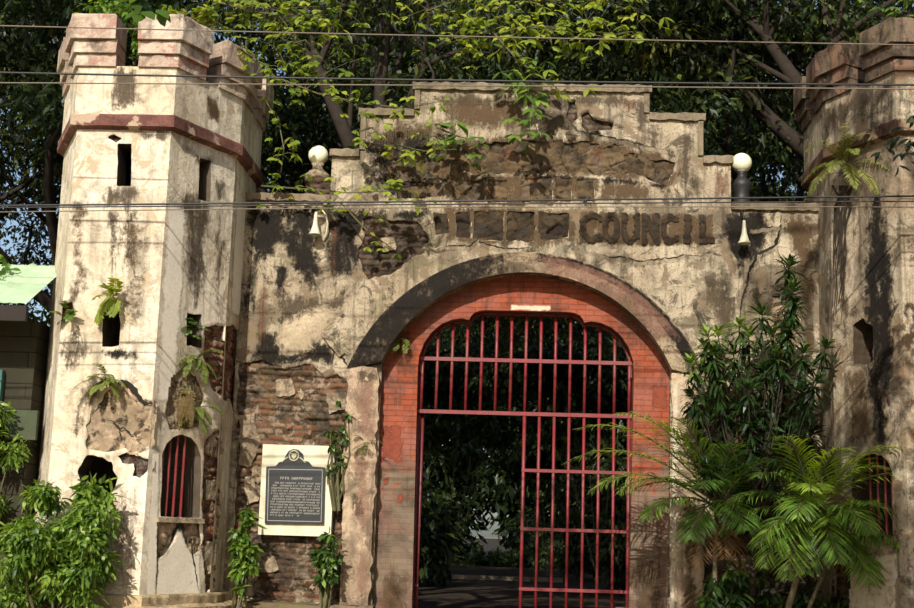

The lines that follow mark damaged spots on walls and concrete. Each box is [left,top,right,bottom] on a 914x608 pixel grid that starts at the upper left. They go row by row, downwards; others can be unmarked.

damp [111,67,139,110]
damp [181,193,225,305]
flaking render [86,204,348,602]
damp [247,333,333,366]
damp [242,206,425,323]
flaking render [358,102,675,279]
damp [347,92,767,382]
damp [839,228,849,316]
damp [844,189,894,447]
damp [352,493,363,516]